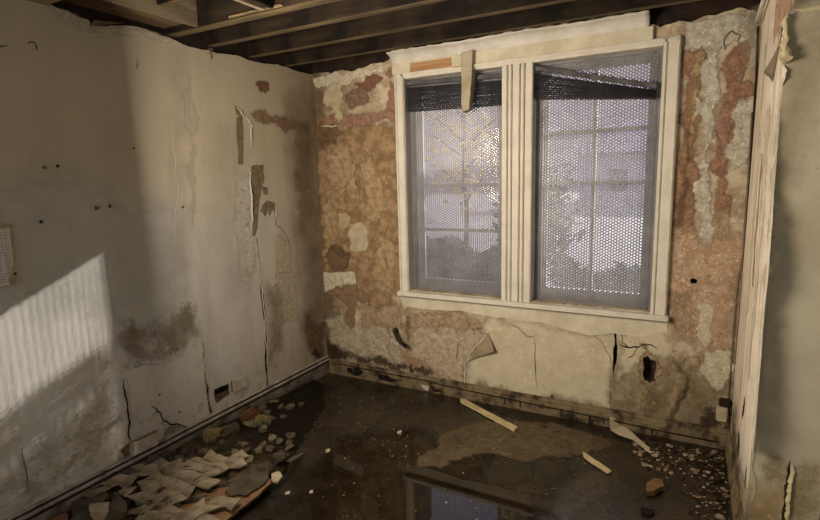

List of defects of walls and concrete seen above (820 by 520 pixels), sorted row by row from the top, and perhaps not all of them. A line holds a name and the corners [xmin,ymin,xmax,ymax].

flaking render [235,67,400,310]
flaking render [667,0,794,510]
mould [123,307,197,362]
peeling [404,309,488,382]
crack [513,325,537,385]
crack [593,333,716,412]
crack [152,406,187,427]
damp [643,366,779,520]
crack [781,461,795,520]